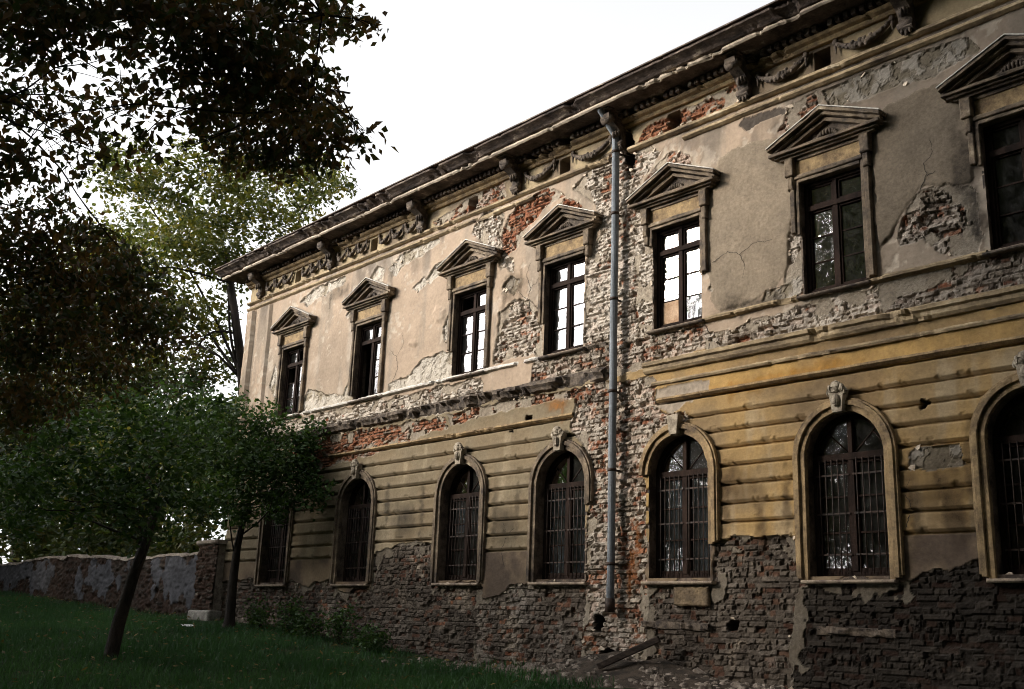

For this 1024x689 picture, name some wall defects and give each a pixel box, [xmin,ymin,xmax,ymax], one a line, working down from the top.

flaking render [220,83,1024,689]
peeling [0,559,56,596]
peeling [74,557,131,601]
peeling [149,555,198,610]